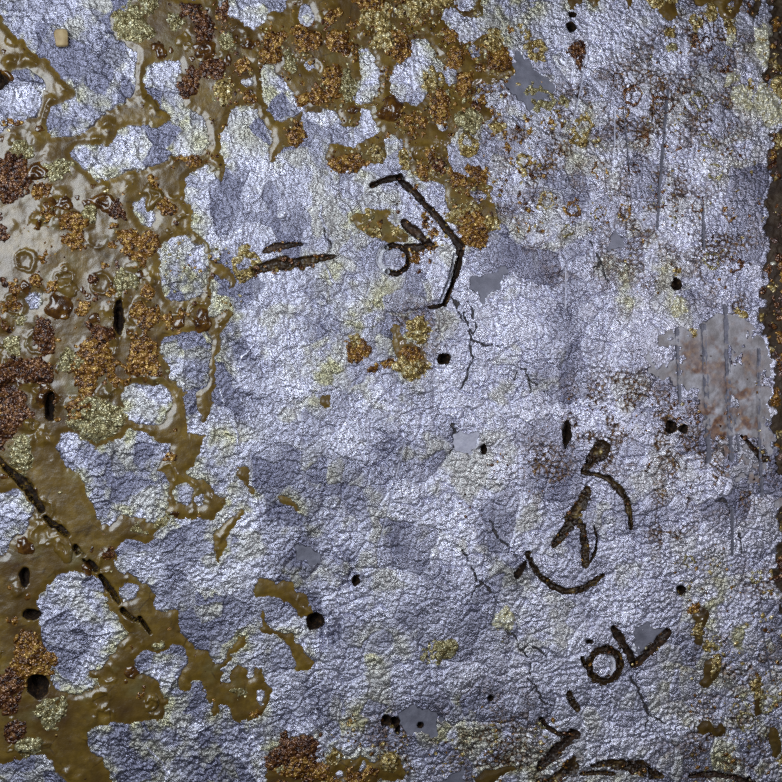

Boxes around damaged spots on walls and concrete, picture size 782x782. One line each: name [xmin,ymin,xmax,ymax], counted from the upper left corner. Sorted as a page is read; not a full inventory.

peeling [470,266,509,304]
spalling [113,298,125,335]
hole [437,353,451,364]
spalling [45,392,55,421]
corrosion [567,380,647,443]
peeling [453,430,487,455]
spalling [18,567,30,587]
spalling [22,609,42,620]
hole [306,612,325,630]
spalling [27,674,49,700]
peeling [381,705,444,738]